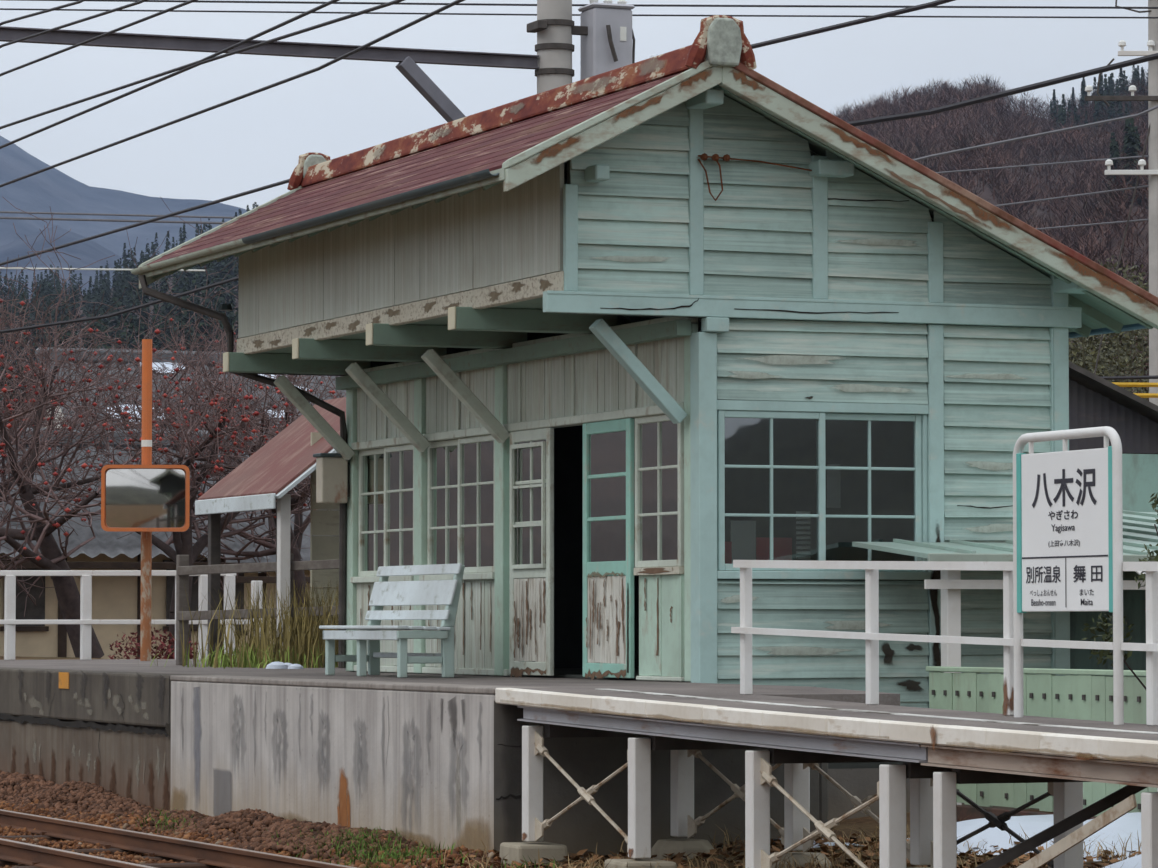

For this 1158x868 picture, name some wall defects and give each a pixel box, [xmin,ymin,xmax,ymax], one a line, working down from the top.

corrosion [615,94,663,121]
corrosion [534,137,579,163]
corrosion [825,125,1012,230]
peeling [303,309,400,336]
peeling [489,282,525,302]
crack [601,298,699,310]
crack [734,307,899,315]
peeling [514,580,545,658]
peeling [586,579,624,657]
damp [441,699,464,737]
damp [214,770,231,816]
corrosion [337,771,350,827]